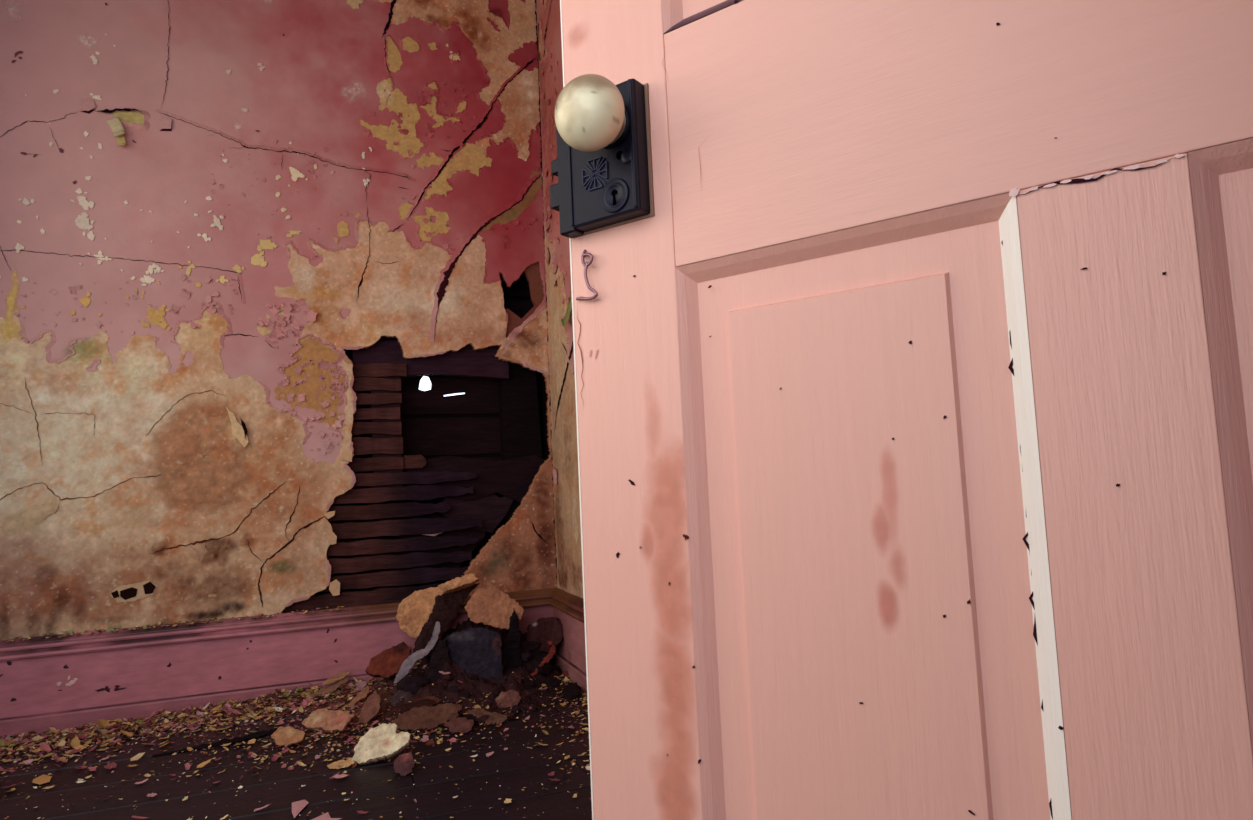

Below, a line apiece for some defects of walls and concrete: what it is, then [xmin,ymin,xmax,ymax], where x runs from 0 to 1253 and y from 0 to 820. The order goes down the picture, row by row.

crack [150,481,324,608]
flaking render [0,0,583,642]
crack [0,0,584,578]